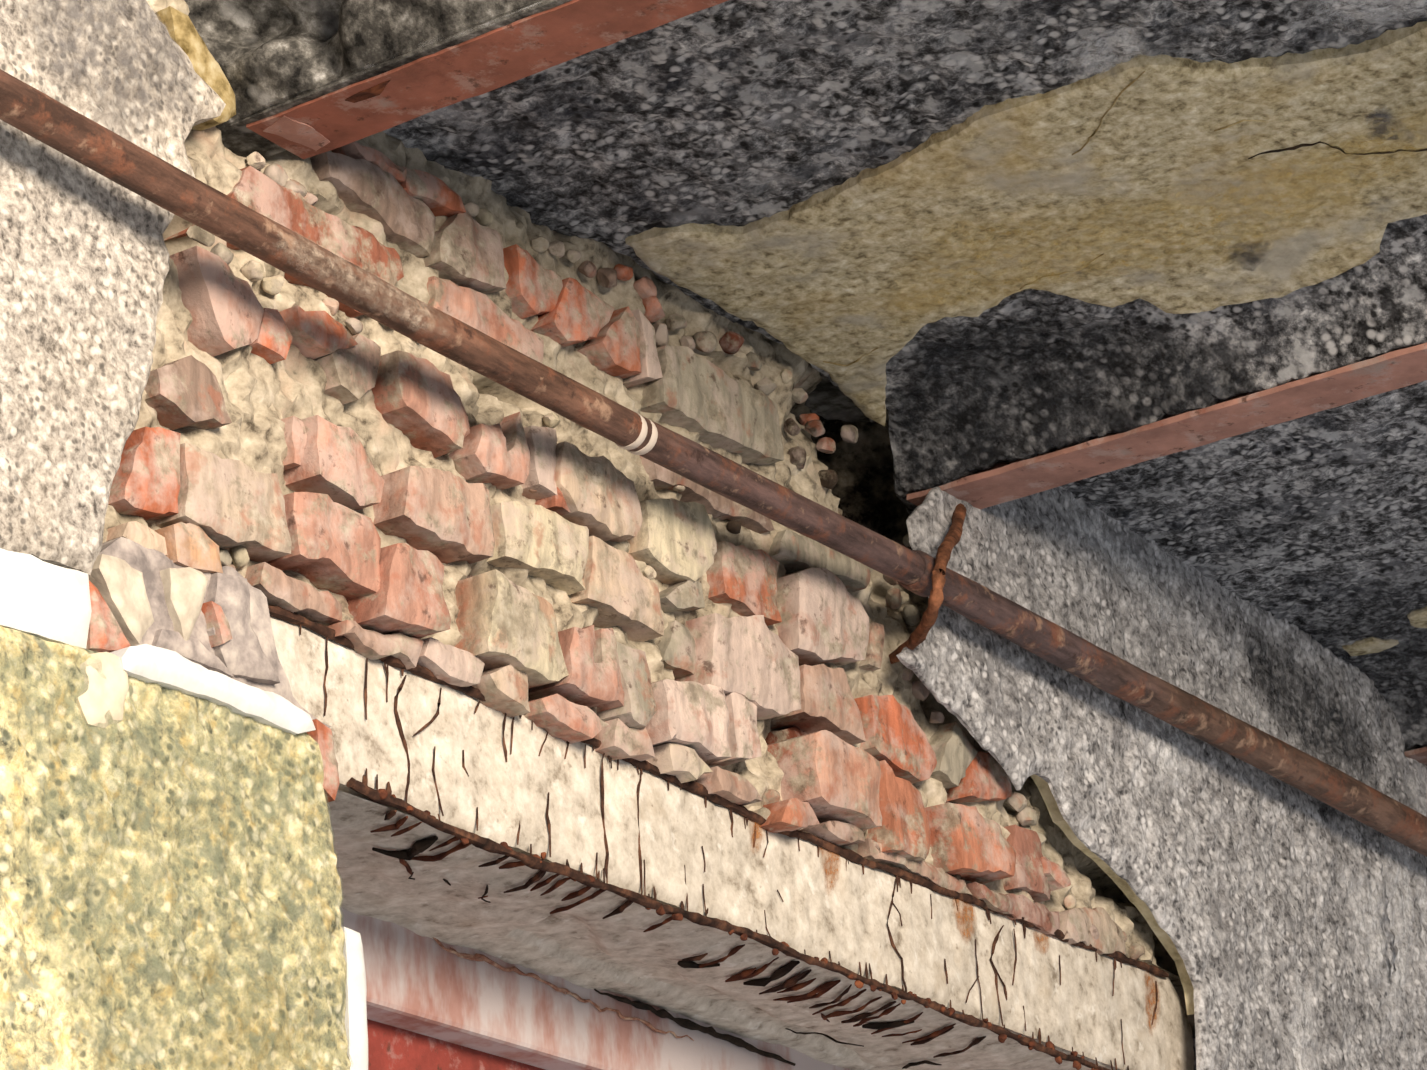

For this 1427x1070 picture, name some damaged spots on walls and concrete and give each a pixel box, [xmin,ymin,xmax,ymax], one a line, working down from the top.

crack [1072,71,1146,155]
crack [1214,120,1427,159]
flaking render [146,0,1427,550]
flaking render [86,214,1196,1070]
crack [408,872,491,903]
corrosion [821,847,840,888]
crack [887,879,906,988]